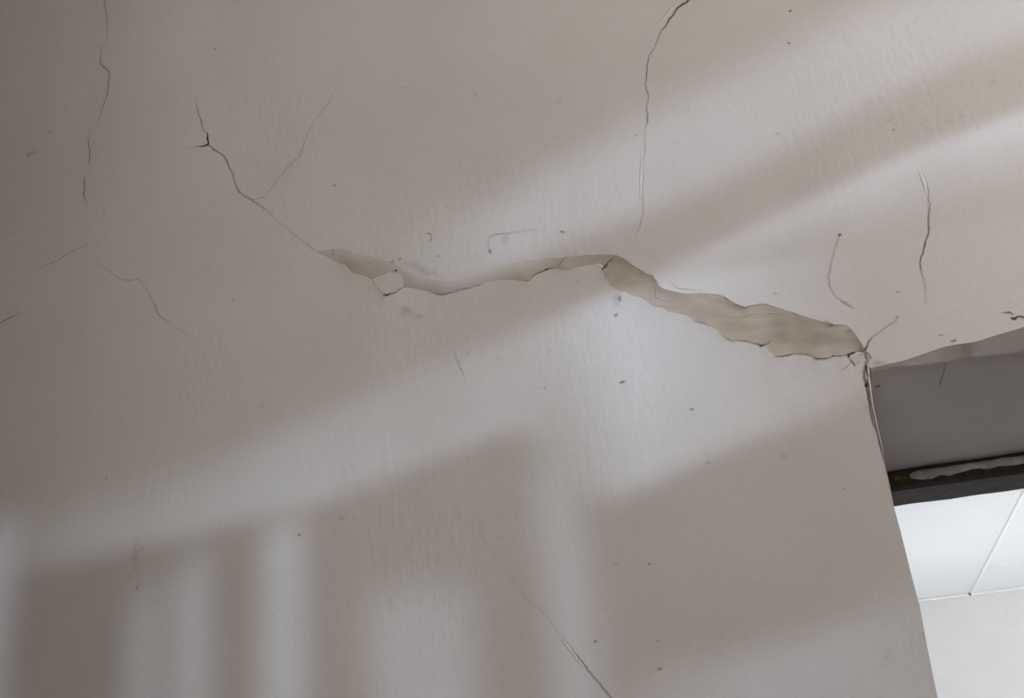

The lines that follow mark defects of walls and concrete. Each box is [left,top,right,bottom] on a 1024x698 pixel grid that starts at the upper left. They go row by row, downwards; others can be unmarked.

crack [654,0,689,28]
spalling [315,249,884,456]